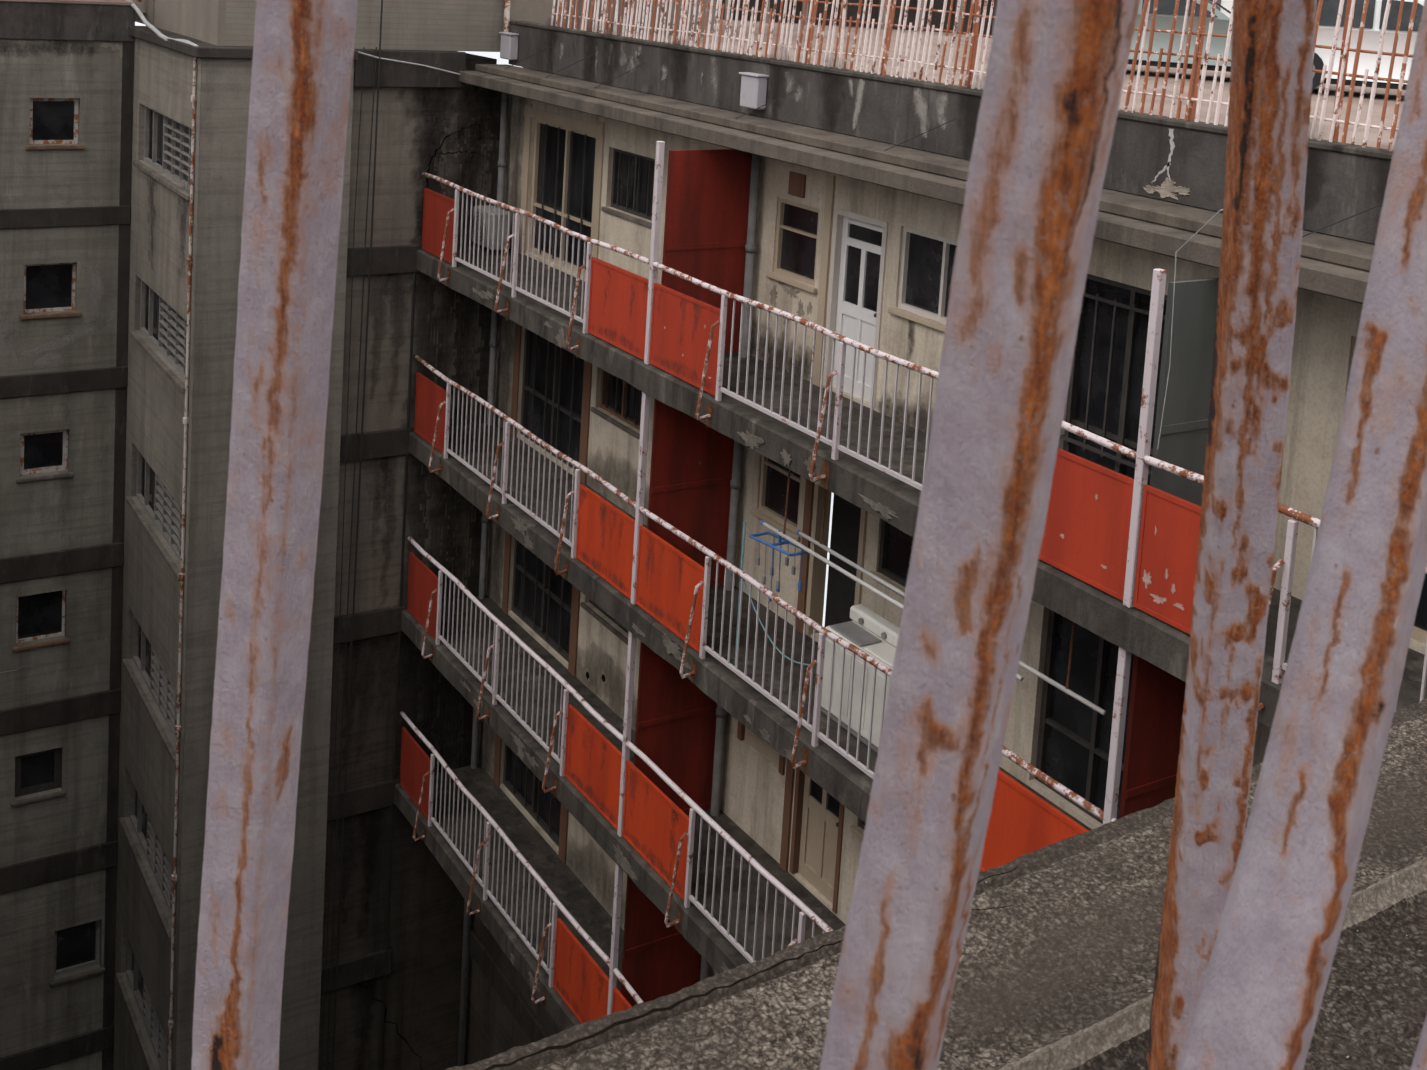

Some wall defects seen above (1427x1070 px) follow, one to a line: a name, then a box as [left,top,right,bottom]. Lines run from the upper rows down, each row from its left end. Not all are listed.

leakage [825,65,865,128]
leakage [914,88,982,146]
peeling [1142,569,1184,610]